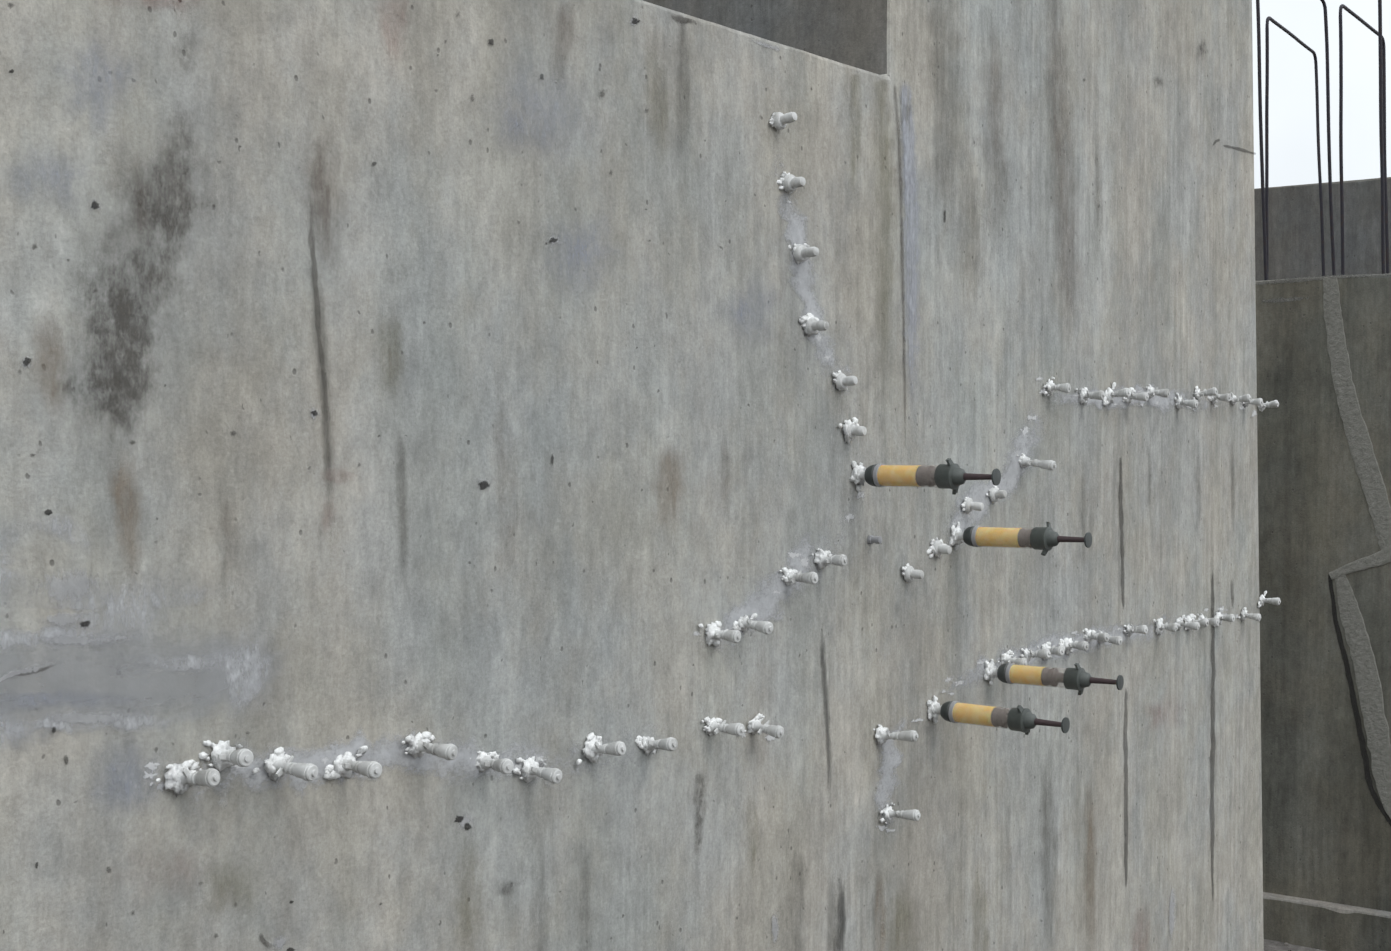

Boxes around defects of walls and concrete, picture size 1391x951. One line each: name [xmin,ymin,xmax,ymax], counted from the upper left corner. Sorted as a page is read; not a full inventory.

crack [780,196,849,372]
crack [949,378,1257,547]
crack [694,538,820,644]
crack [1323,278,1391,826]
crack [942,606,1238,696]
crack [143,762,165,791]
crack [198,732,590,794]
crack [742,732,775,741]
crack [875,718,923,833]